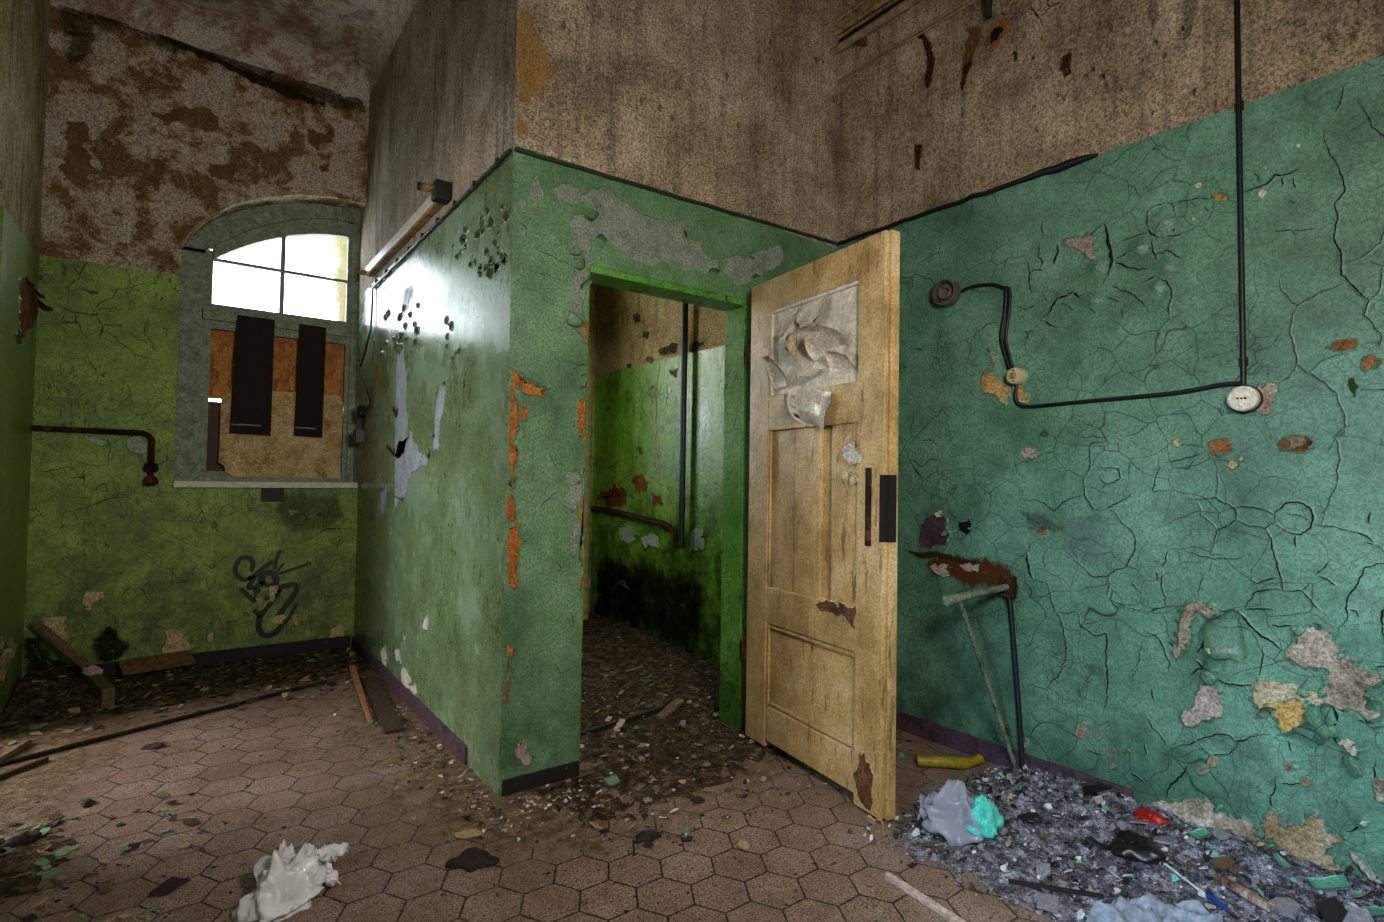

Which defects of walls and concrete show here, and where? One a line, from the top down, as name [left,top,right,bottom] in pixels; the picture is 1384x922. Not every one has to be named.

water stain [63,7,364,112]
peeling [57,121,97,185]
peeling [150,105,220,133]
peeling [305,127,336,174]
peeling [452,164,784,344]
peeling [444,316,462,362]
peeling [627,311,705,378]
crack [971,73,1384,877]
peeling [380,614,430,696]
peeling [1168,598,1247,729]
peeling [1247,621,1384,804]
spalling [1143,785,1384,884]